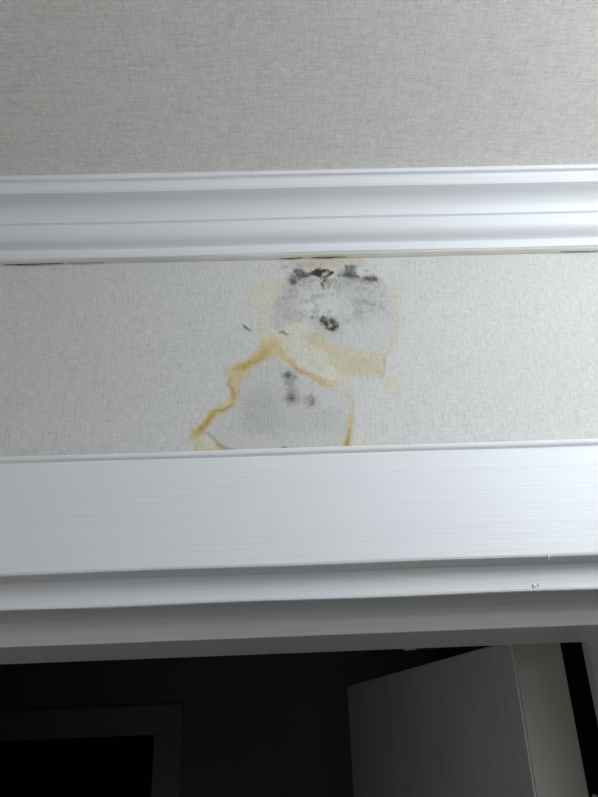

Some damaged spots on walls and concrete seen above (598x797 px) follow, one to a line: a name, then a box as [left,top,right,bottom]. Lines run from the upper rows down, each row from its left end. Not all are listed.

water stain [186,258,406,451]